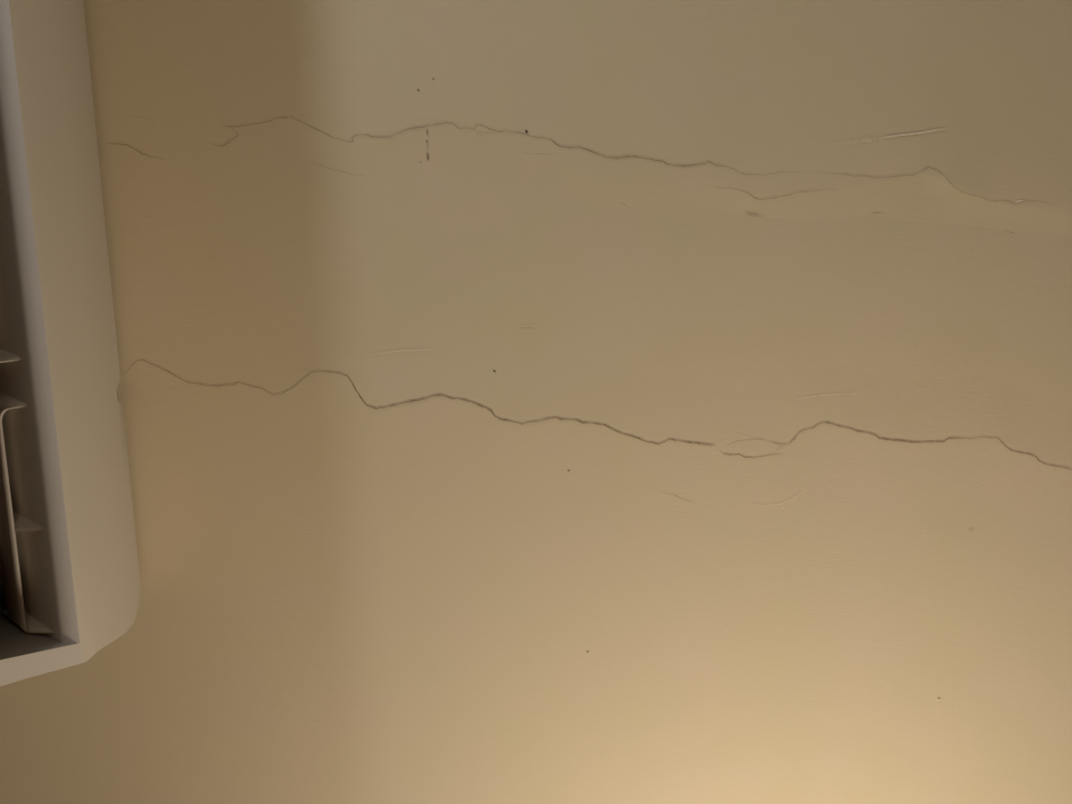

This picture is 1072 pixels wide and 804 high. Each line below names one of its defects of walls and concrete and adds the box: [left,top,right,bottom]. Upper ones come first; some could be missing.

crack [353,385,795,458]
crack [826,422,957,443]